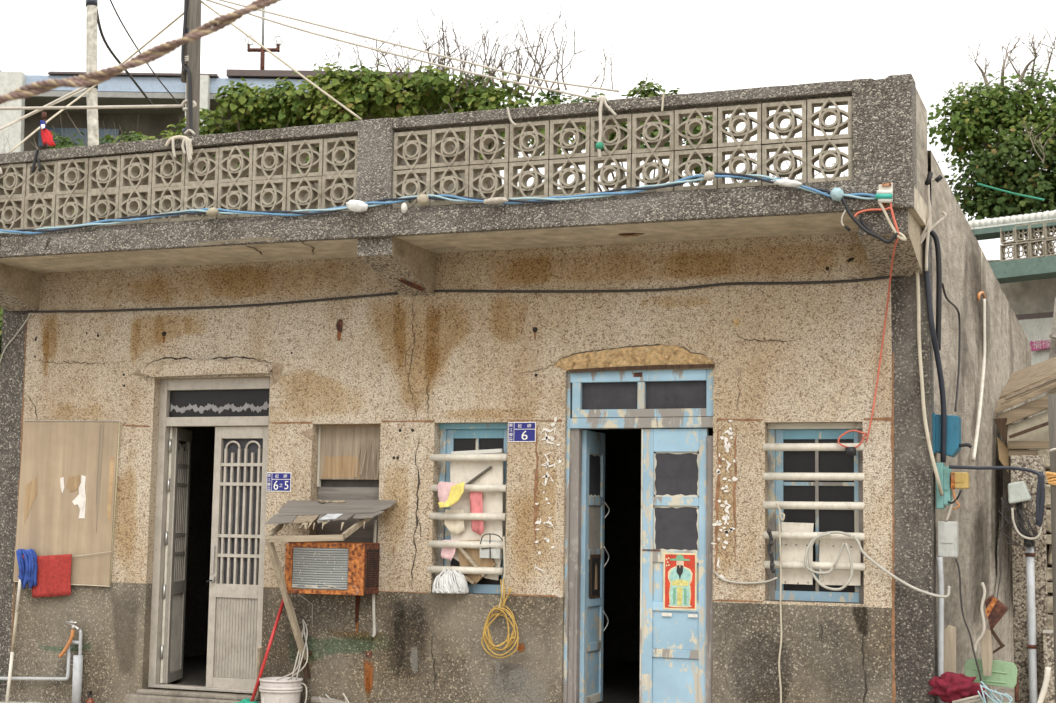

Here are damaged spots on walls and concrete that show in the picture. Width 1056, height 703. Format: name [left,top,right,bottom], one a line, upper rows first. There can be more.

crack [405,299,429,589]
peeling [711,420,738,579]
crack [429,633,437,691]
crack [860,608,868,703]